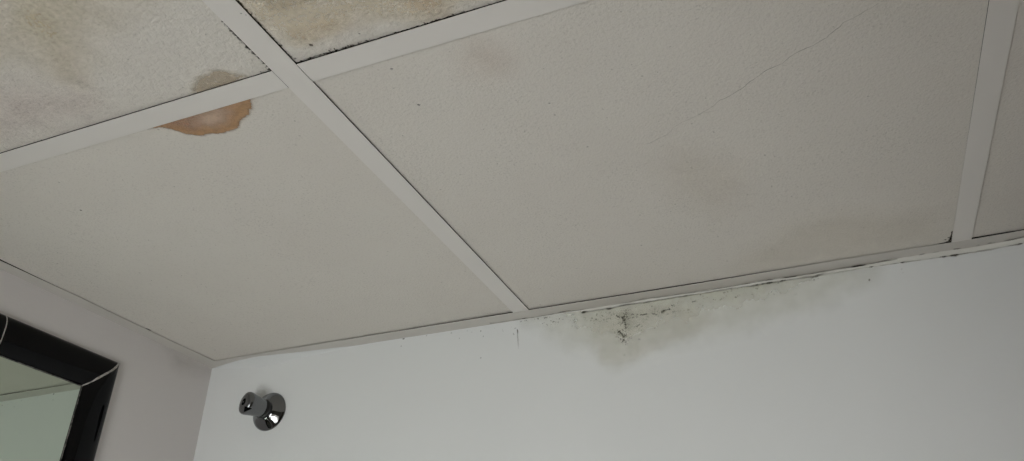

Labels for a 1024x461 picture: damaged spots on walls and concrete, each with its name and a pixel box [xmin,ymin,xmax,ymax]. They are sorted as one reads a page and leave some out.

leakage [153,99,252,136]